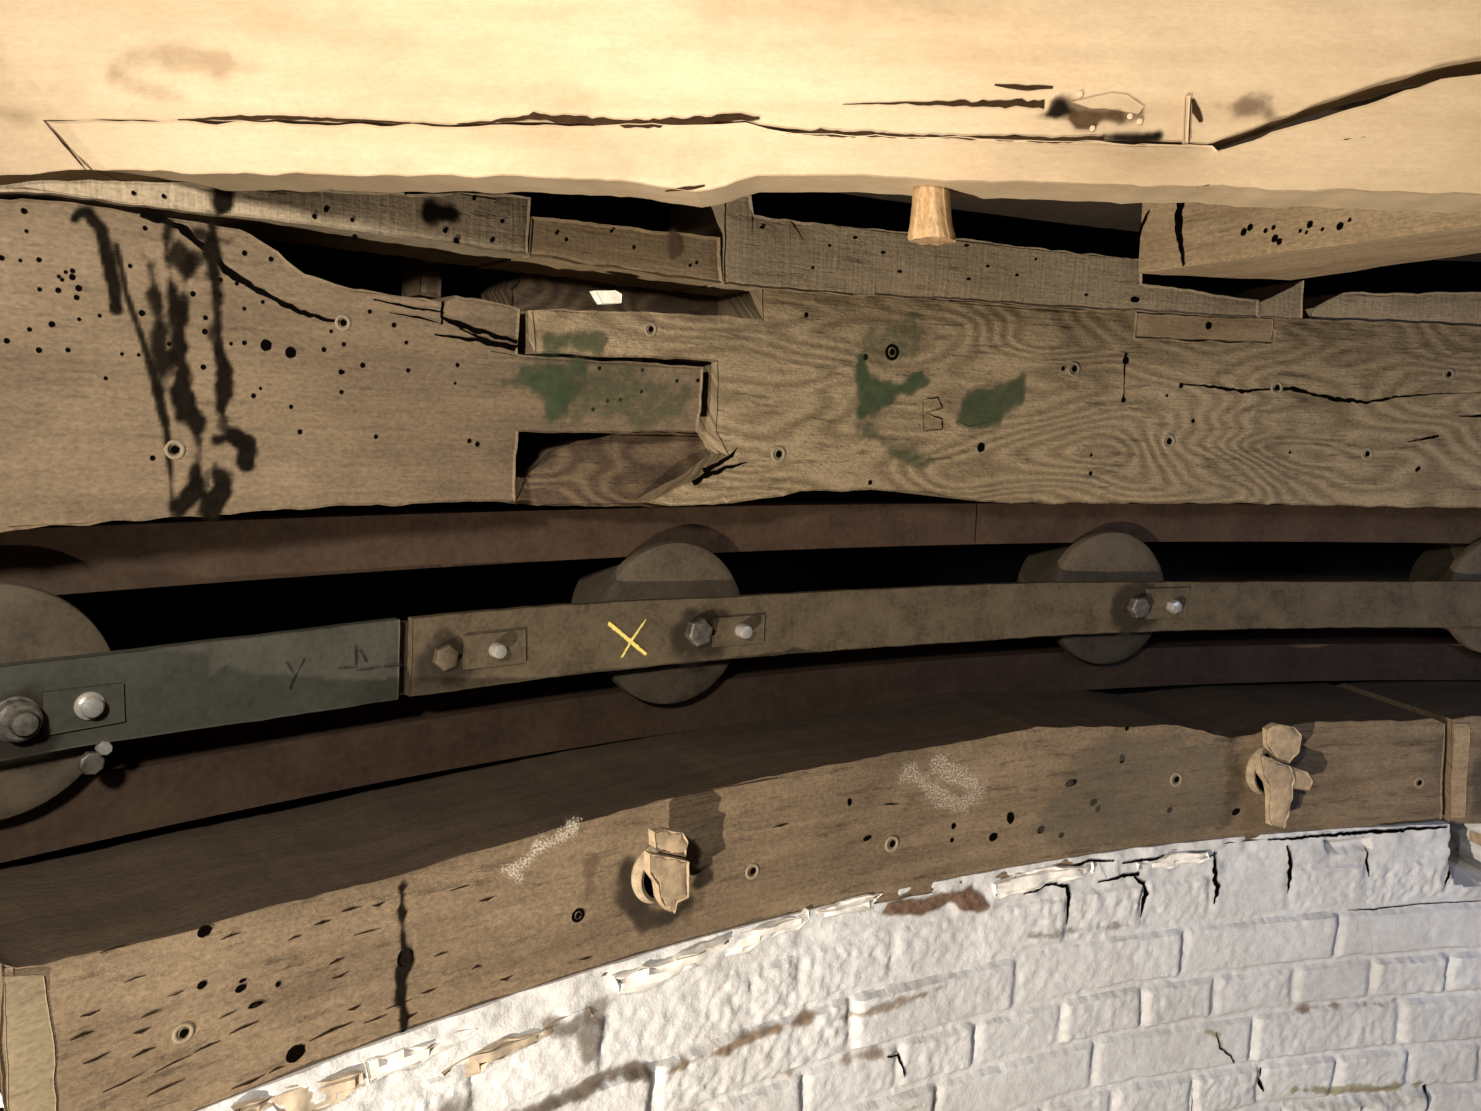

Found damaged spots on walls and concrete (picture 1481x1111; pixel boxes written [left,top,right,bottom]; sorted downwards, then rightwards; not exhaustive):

crack [140,209,340,323]
crack [373,298,517,356]
crack [1183,383,1481,442]
peeling [882,887,989,916]
crack [1023,851,1220,925]
crack [1267,826,1477,911]
spalling [309,988,436,1042]
peeling [543,1001,604,1064]